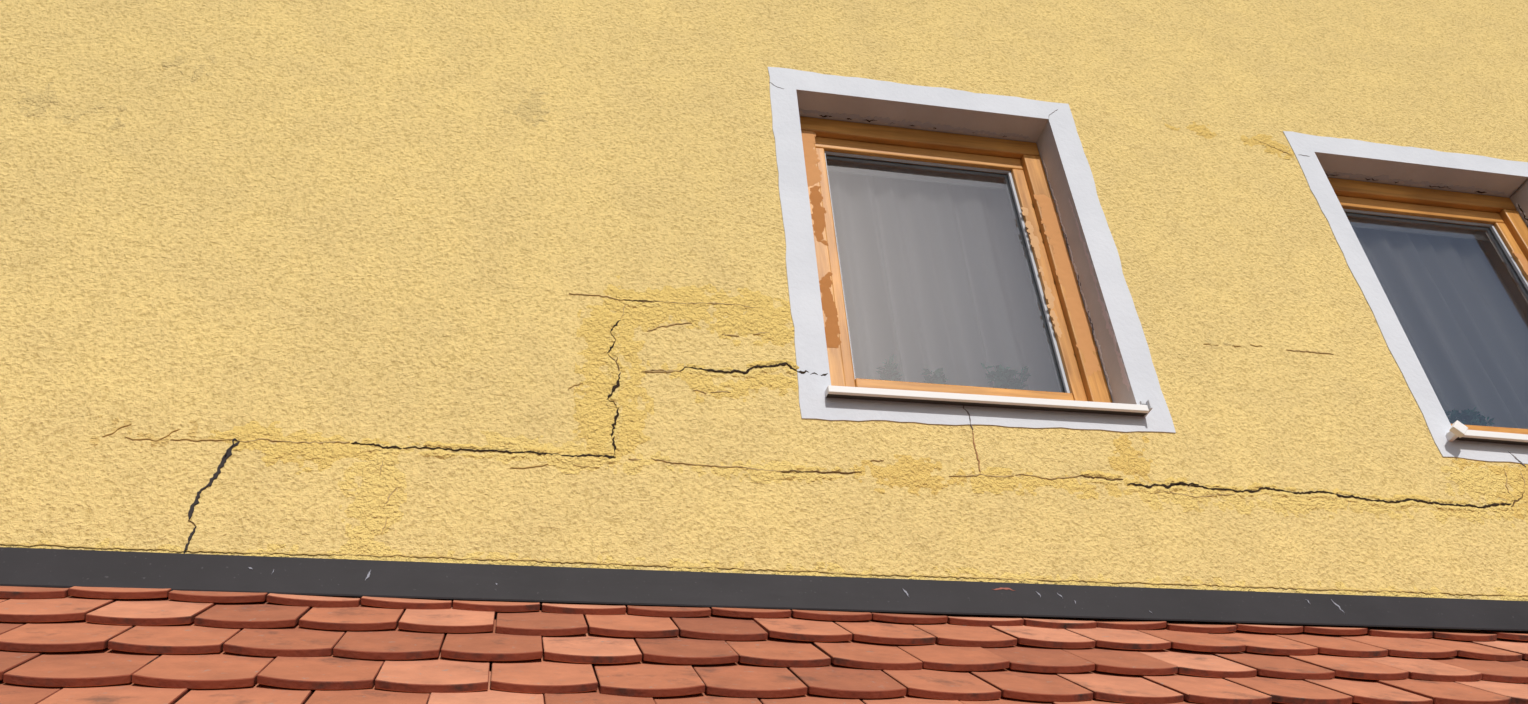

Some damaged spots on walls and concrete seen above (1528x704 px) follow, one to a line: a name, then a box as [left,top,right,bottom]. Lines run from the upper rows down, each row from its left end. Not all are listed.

crack [0,293,1528,597]